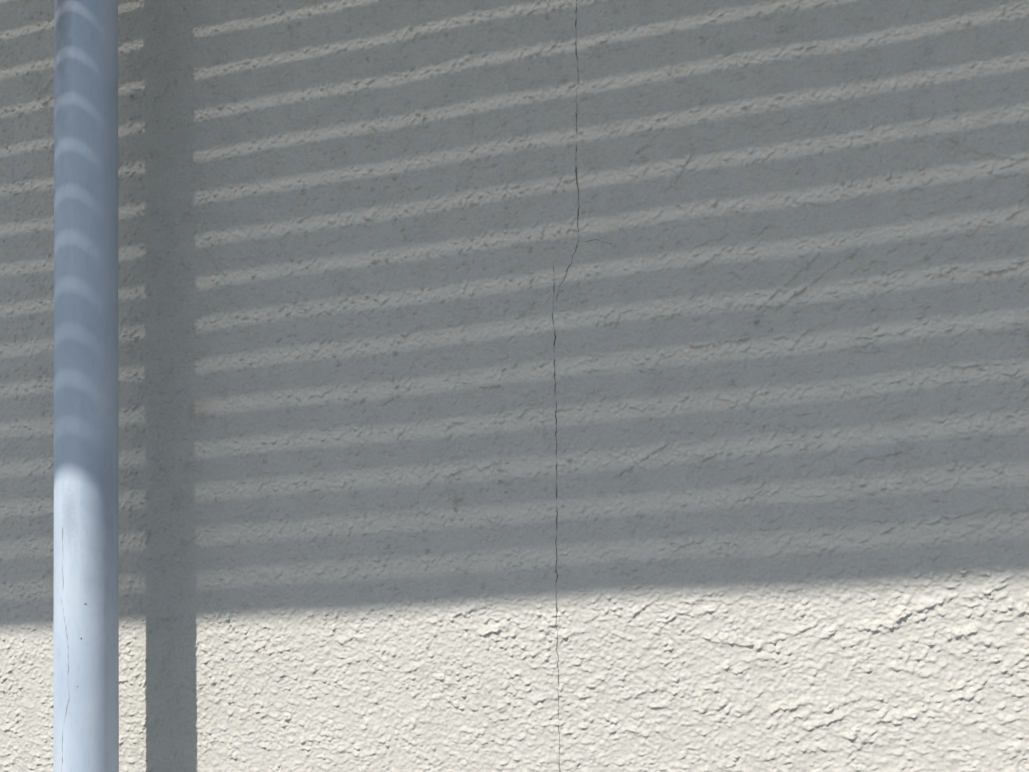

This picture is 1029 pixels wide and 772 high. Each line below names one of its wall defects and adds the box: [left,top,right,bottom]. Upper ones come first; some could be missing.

crack [552,0,618,772]